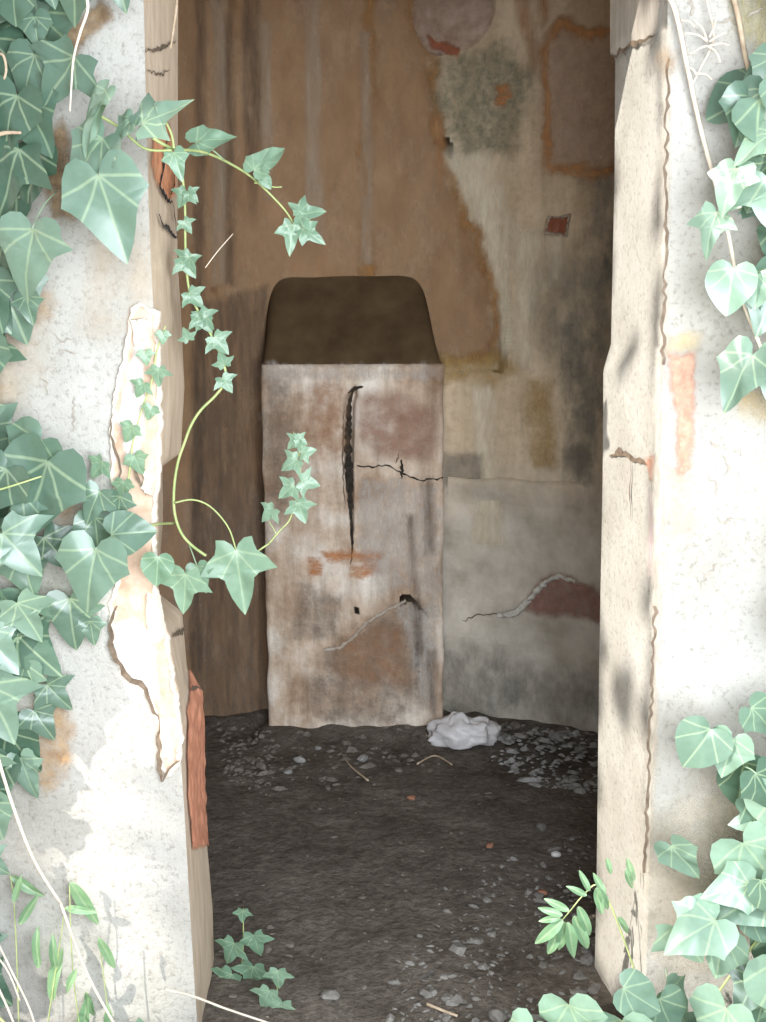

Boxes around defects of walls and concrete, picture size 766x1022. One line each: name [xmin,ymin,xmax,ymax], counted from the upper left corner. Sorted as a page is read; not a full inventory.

flaking render [152,126,177,199]
flaking render [660,58,695,474]
crack [342,386,443,564]
flaking render [108,302,209,850]
flaking render [463,573,600,622]